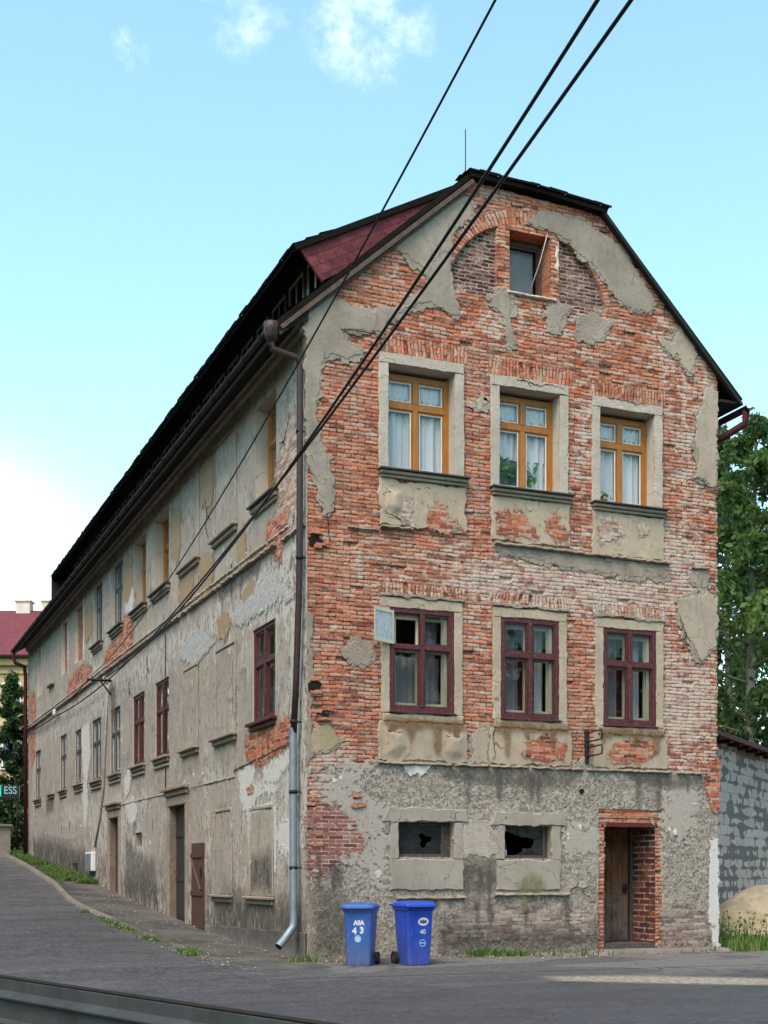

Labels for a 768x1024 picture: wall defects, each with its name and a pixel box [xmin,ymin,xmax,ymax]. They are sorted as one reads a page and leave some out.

peeling [525,209,657,316]
peeling [485,289,518,351]
peeling [541,301,614,349]
peeling [657,326,698,377]
peeling [179,195,477,669]
peeling [492,504,671,584]
flaking render [65,554,134,706]
flaking render [242,712,291,821]
flaking render [521,731,571,766]
flaking render [286,794,376,886]
damp [464,863,497,920]